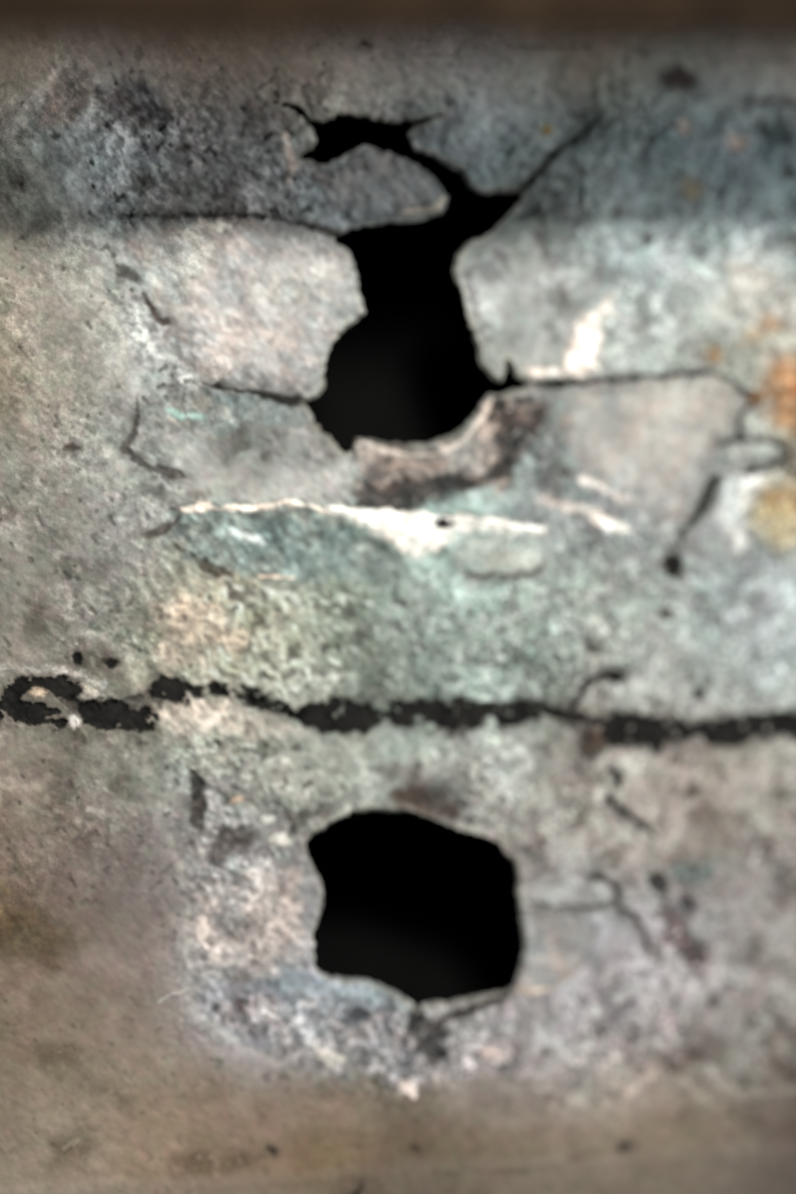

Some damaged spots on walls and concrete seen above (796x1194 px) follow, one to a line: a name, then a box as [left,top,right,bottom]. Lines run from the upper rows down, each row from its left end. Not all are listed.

crack [518,111,604,192]
crack [130,213,338,234]
spalling [139,100,546,511]
crack [204,383,305,407]
crack [122,423,184,479]
crack [534,370,796,546]
peeling [172,499,401,583]
spalling [434,514,455,529]
peeling [457,533,543,580]
crack [0,652,796,837]
spalling [189,771,206,832]
spalling [158,807,597,1099]